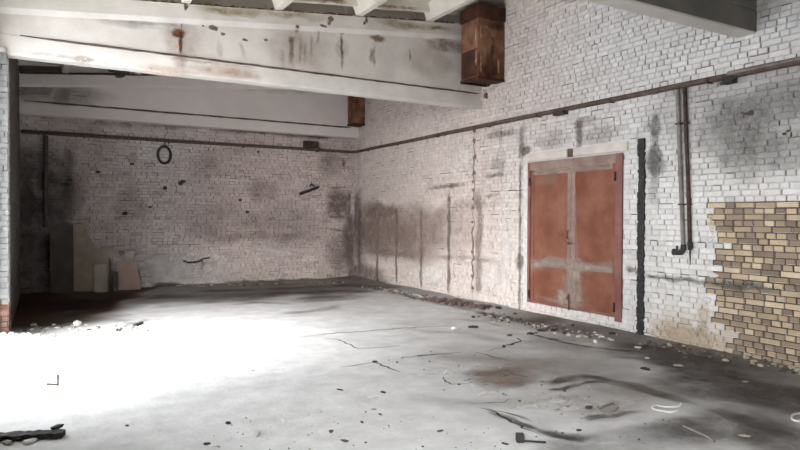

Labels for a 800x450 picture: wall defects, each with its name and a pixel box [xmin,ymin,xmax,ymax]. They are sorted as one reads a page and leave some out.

rust [173,29,184,50]
damp [648,117,661,178]
damp [419,211,442,285]
crack [469,132,477,293]
flaking render [692,201,800,367]
crack [303,325,530,372]